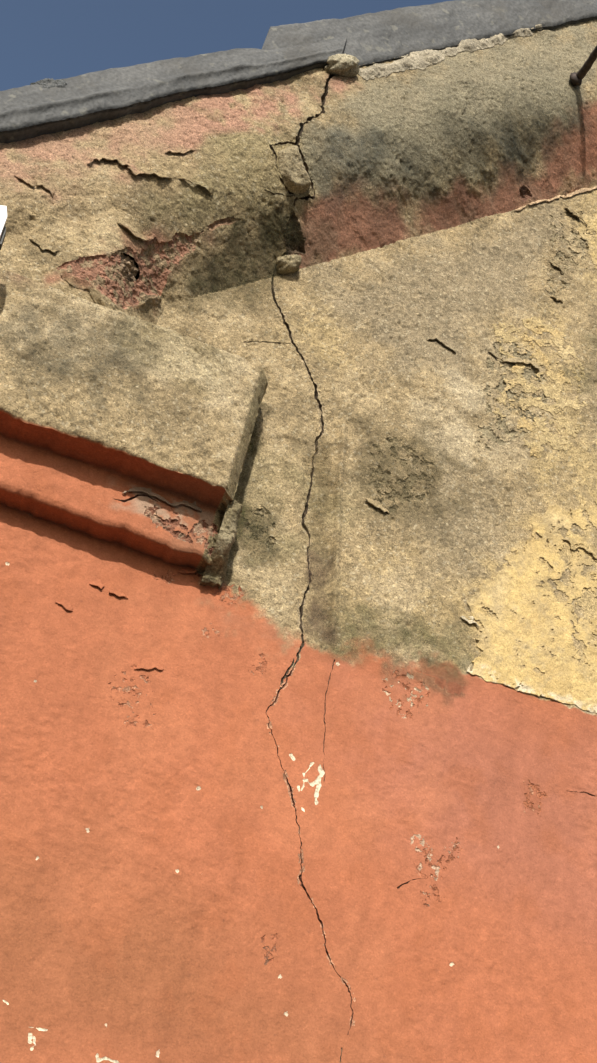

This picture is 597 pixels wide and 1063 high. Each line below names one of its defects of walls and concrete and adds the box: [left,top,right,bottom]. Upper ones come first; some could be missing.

peeling [87,153,214,195]
crack [264,74,335,202]
peeling [29,217,239,319]
water stain [189,212,297,295]
spalling [122,487,218,557]
crack [244,252,356,1062]
peeling [461,500,597,714]
peeling [409,834,463,907]